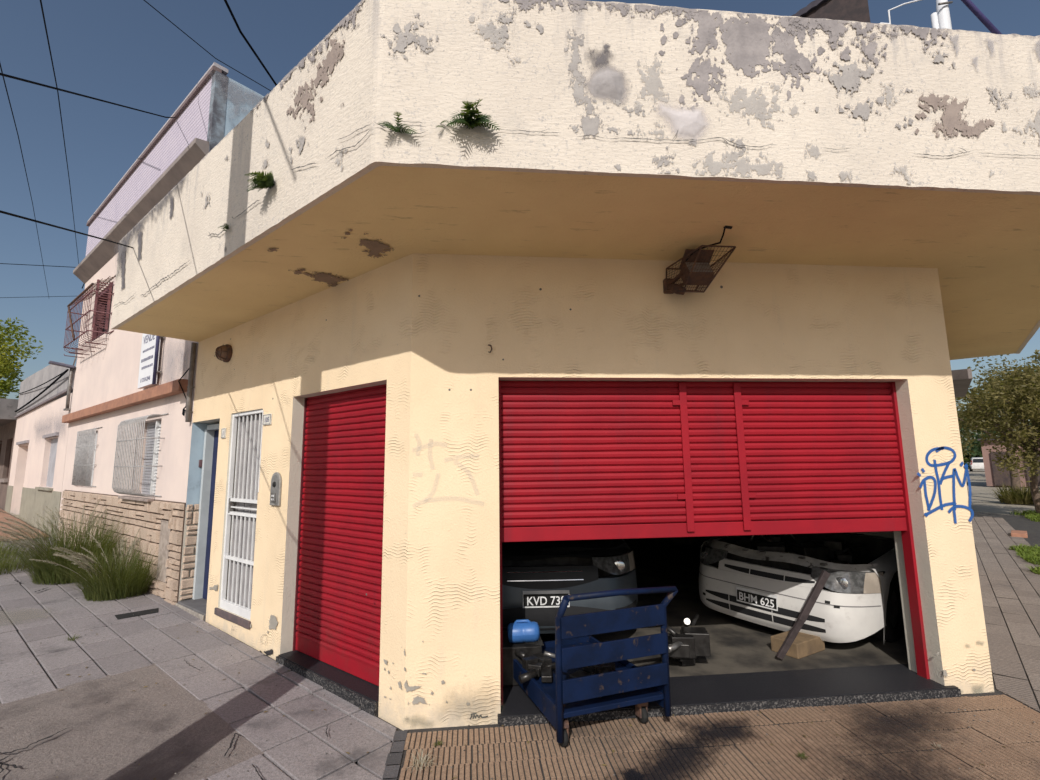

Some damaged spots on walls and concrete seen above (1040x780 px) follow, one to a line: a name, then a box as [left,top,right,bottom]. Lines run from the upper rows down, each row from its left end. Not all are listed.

peeling [380,13,438,60]
peeling [469,4,544,65]
peeling [287,8,358,163]
peeling [564,10,1040,180]
crack [292,121,428,170]
crack [491,129,776,147]
crack [913,147,1038,156]
damp [117,178,183,290]
peeling [341,229,394,258]
peeling [288,269,348,287]
spalling [384,649,445,705]